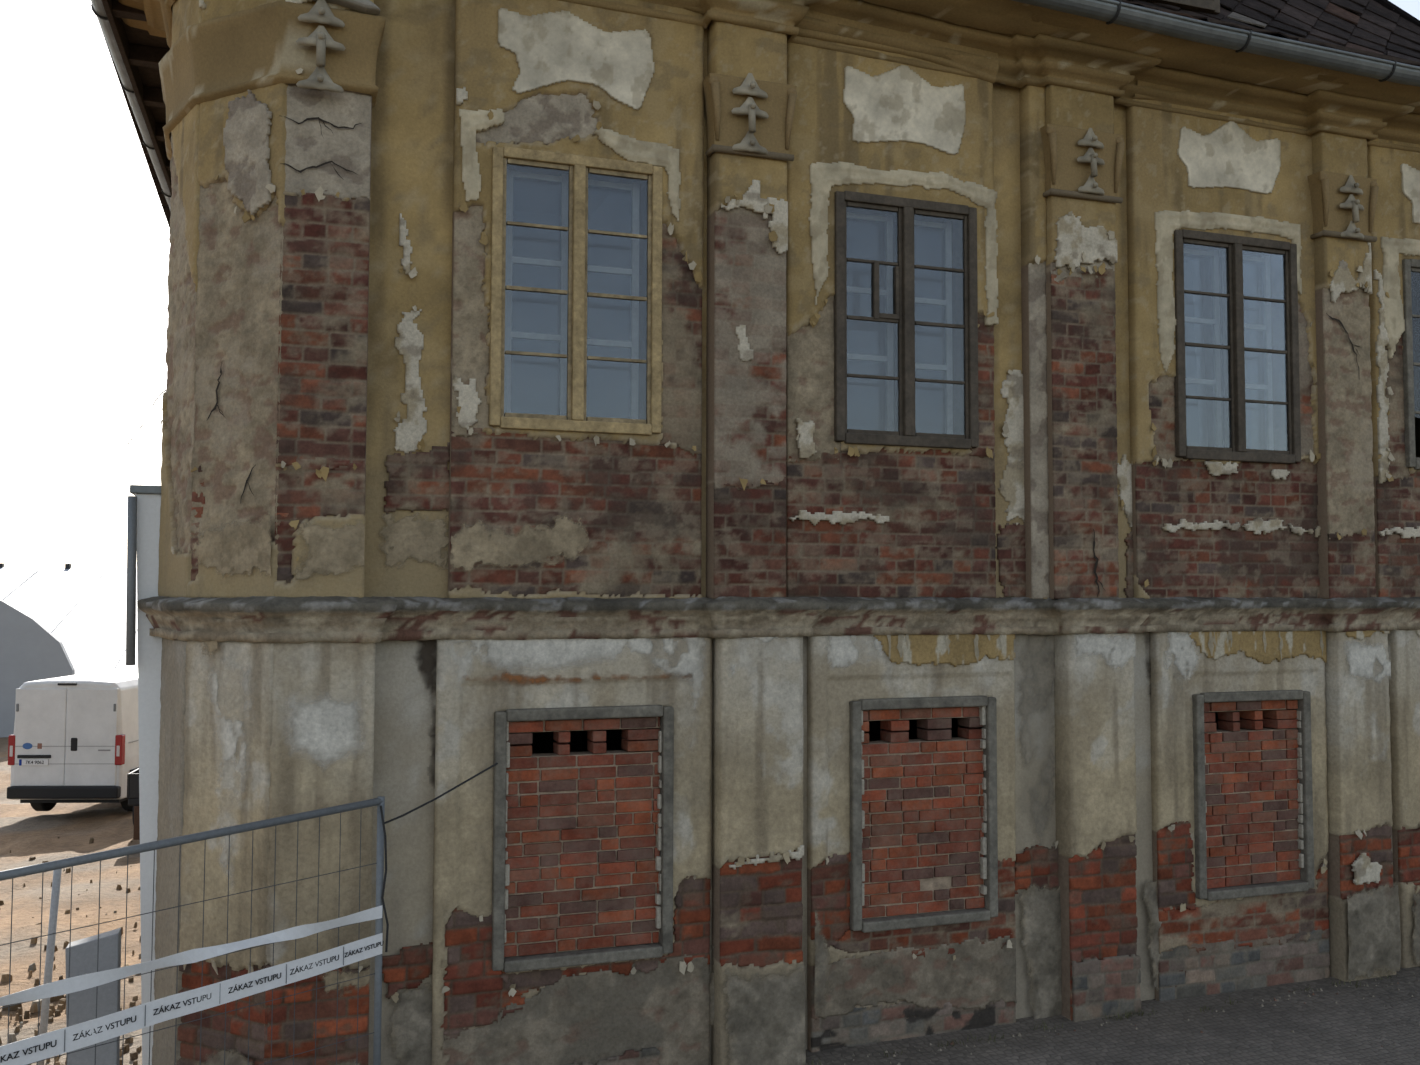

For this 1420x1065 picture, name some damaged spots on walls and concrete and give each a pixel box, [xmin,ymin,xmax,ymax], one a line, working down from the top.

peeling [456,87,468,106]
flaking render [476,93,602,146]
crack [207,363,225,420]
flaking render [161,68,371,583]
flaking render [384,180,1420,599]
peeling [873,624,1015,667]
flaking render [177,834,1141,1065]
flaking render [1157,821,1420,1001]